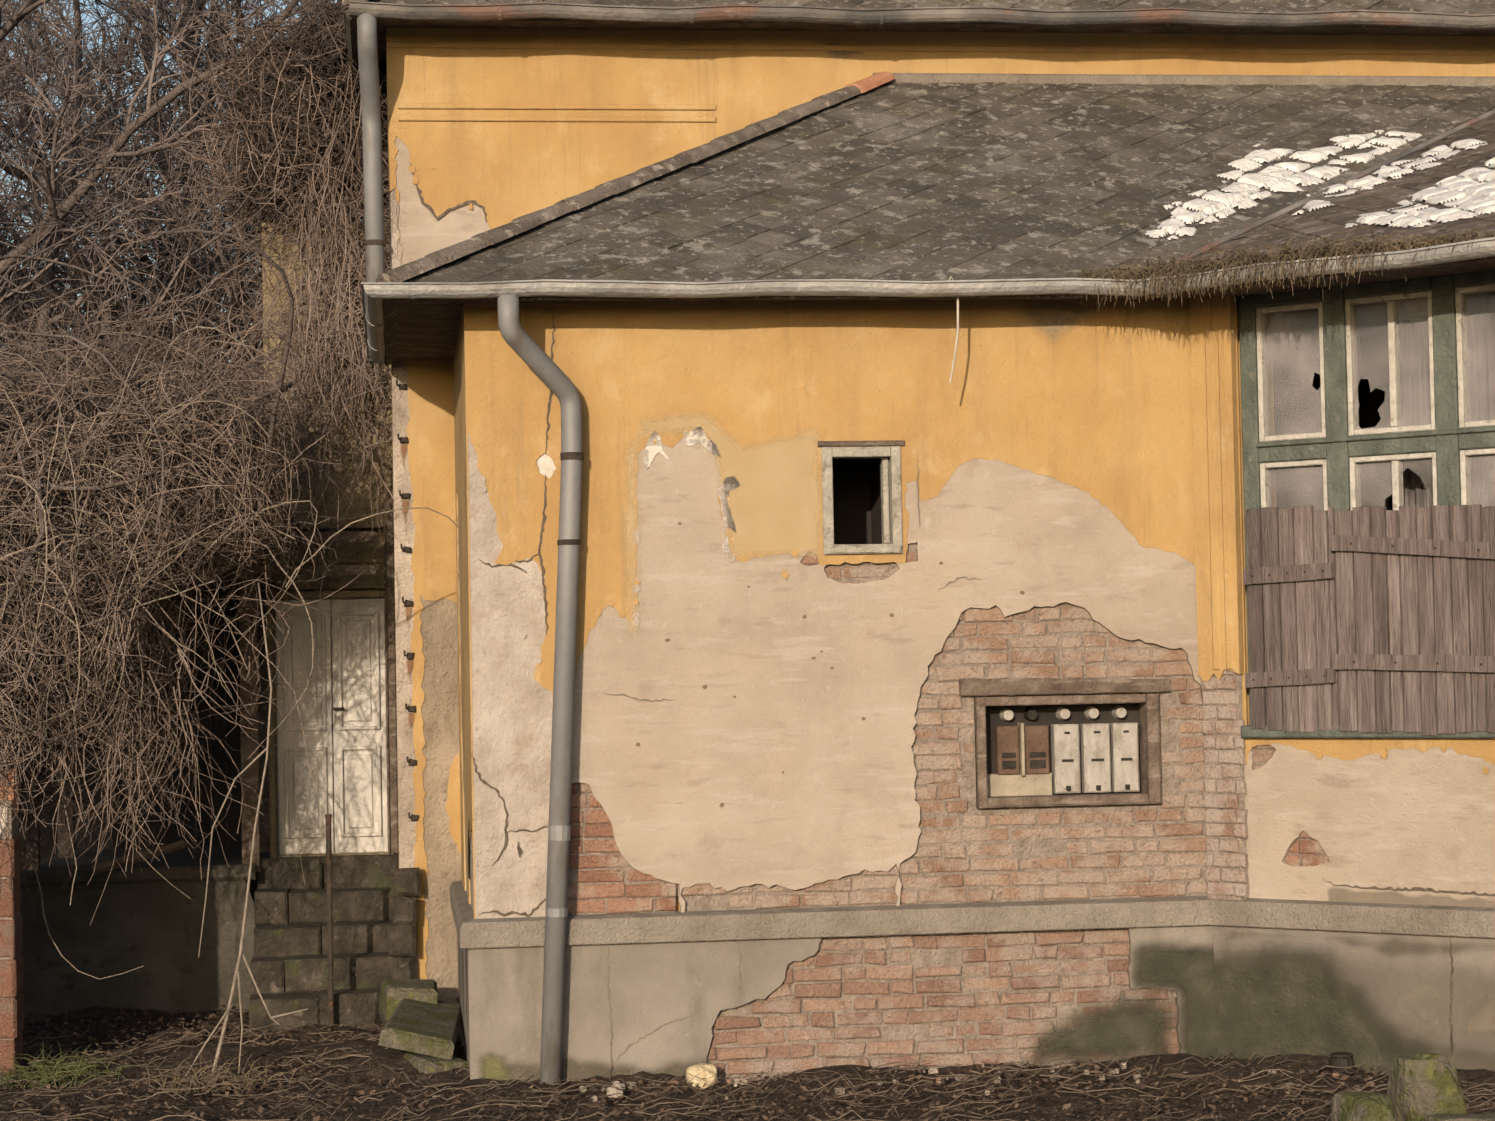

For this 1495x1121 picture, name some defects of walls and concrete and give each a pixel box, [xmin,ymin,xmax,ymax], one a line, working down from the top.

peeling [389,136,491,270]
crack [478,310,556,634]
peeling [392,361,556,1004]
crack [468,751,548,917]
peeling [567,427,1495,915]
spalling [707,928,1180,1084]